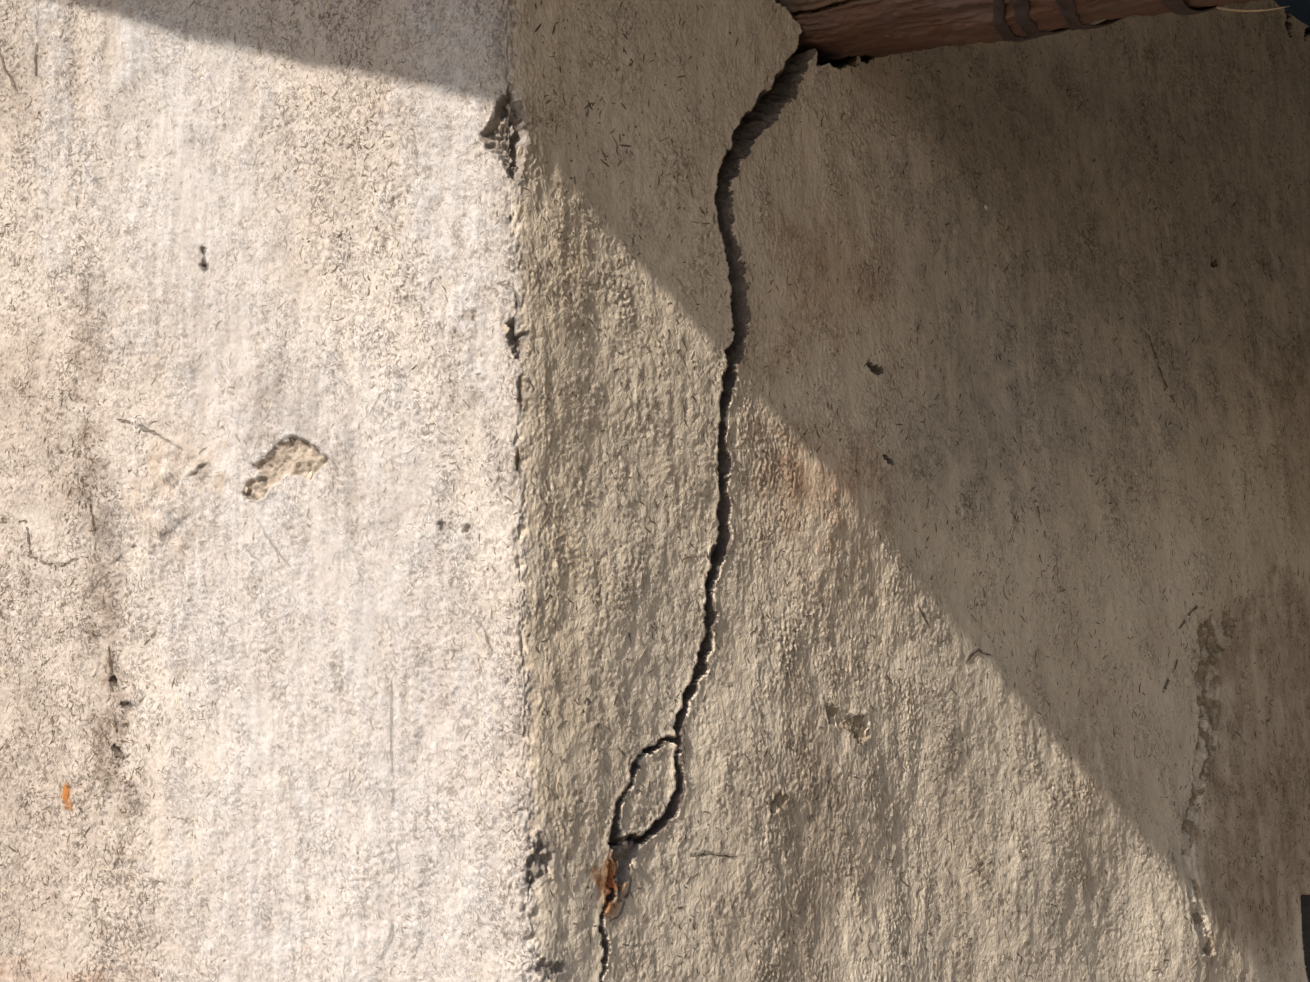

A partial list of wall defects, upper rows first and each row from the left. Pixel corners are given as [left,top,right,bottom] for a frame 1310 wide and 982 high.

spalling [478,88,528,182]
spalling [241,435,330,502]
crack [608,31,817,846]
flaking render [1181,610,1239,957]
crack [599,875,633,982]